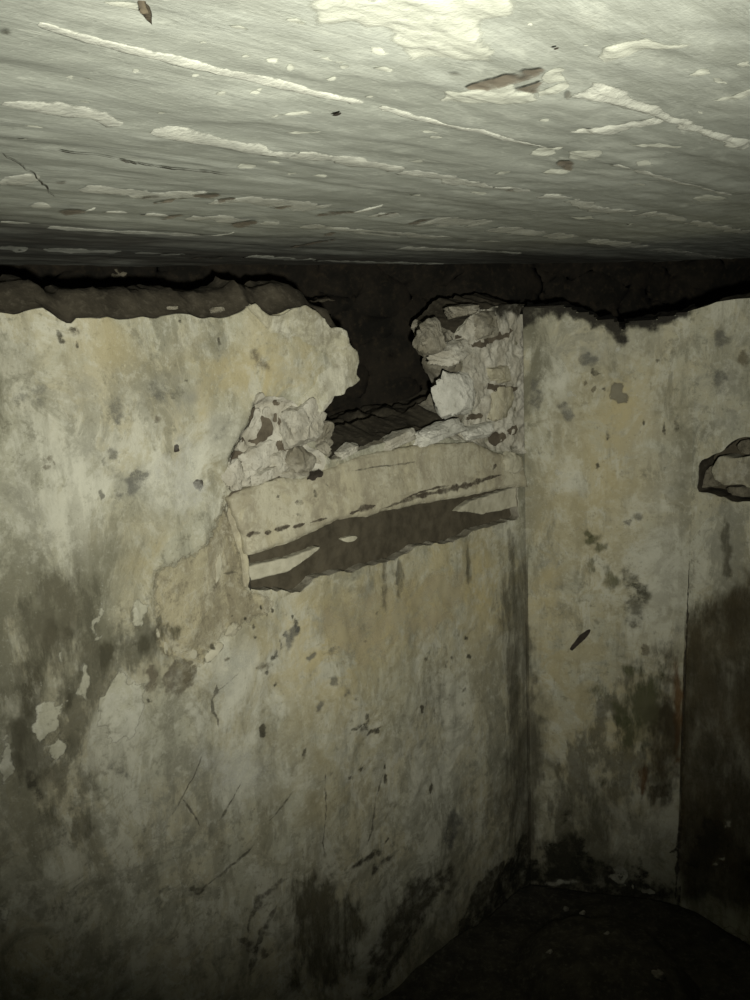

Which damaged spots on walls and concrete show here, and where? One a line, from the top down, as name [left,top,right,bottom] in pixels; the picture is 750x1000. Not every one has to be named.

peeling [310,0,514,62]
peeling [441,67,569,104]
spalling [230,304,360,463]
flaking render [448,305,527,454]
spalling [702,437,750,497]
flaking render [31,663,91,761]
damp [100,644,114,668]
flaking render [97,671,145,743]
damp [146,660,196,703]
damp [459,571,750,935]
damp [290,872,365,991]
damp [367,866,454,995]